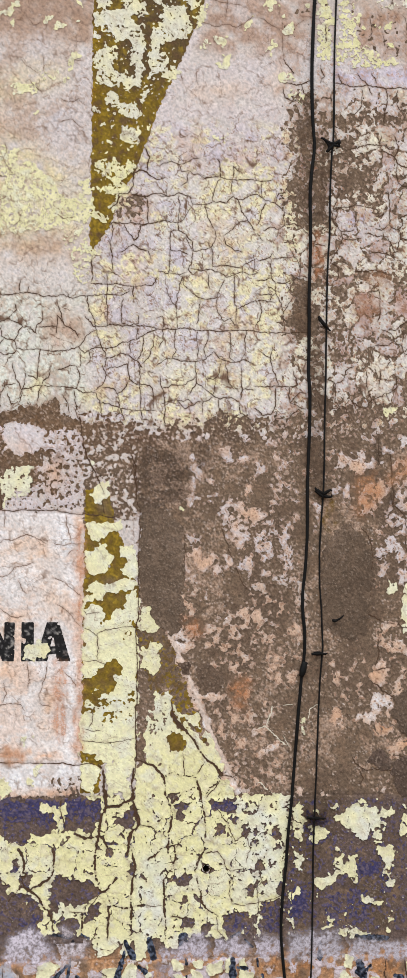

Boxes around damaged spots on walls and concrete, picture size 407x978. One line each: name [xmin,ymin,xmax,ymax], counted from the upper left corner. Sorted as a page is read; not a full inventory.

crack [204,0,324,103]
peeling [263,0,407,69]
peeling [0,0,209,284]
flaking render [279,89,313,244]
crack [313,73,407,284]
flaking render [391,174,407,241]
flaking render [277,274,308,344]
flaking render [288,355,307,382]
crack [318,289,407,417]
crack [0,149,307,940]
peeling [23,639,51,662]
crack [258,704,318,747]